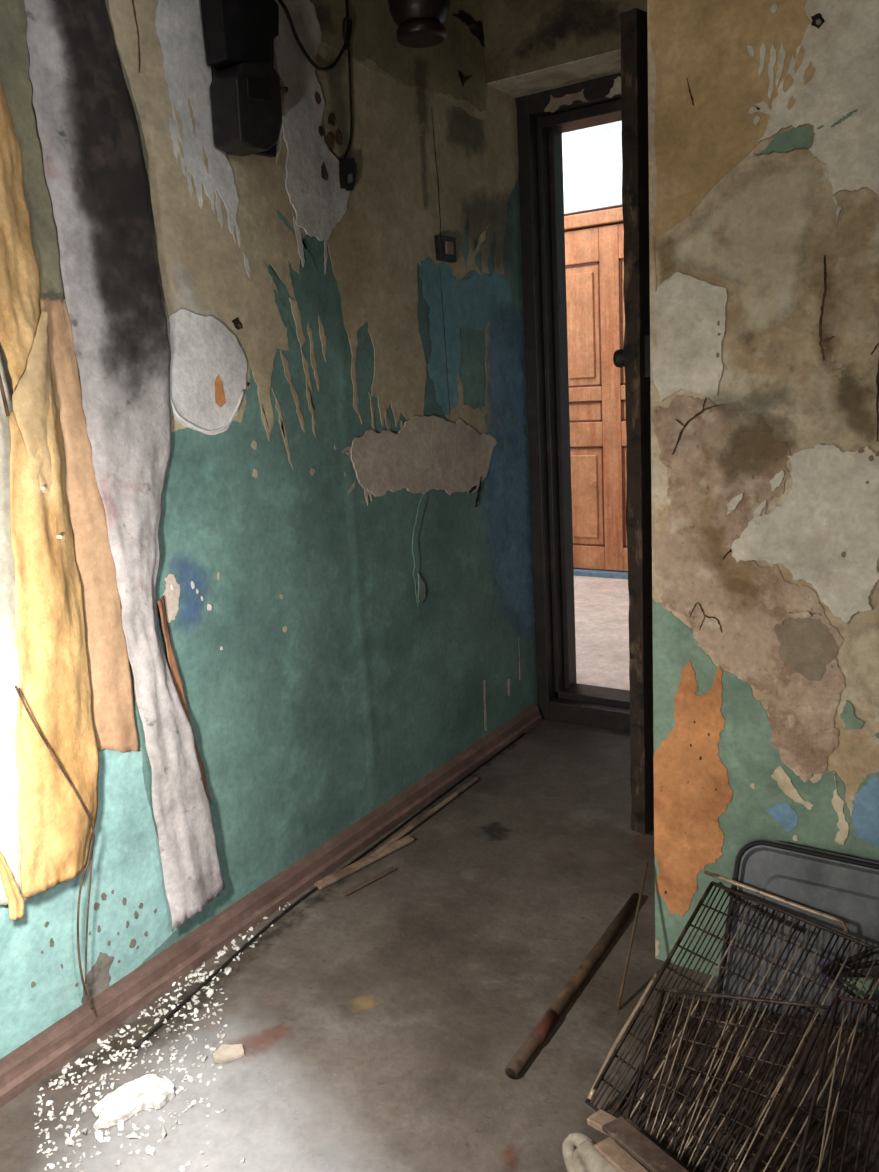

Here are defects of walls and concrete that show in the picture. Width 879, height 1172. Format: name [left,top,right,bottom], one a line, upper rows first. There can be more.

spalling [811,13,825,29]
peeling [747,36,795,126]
peeling [753,125,815,155]
peeling [168,117,251,278]
crack [819,255,835,361]
crack [870,343,879,442]
spalling [651,395,879,977]